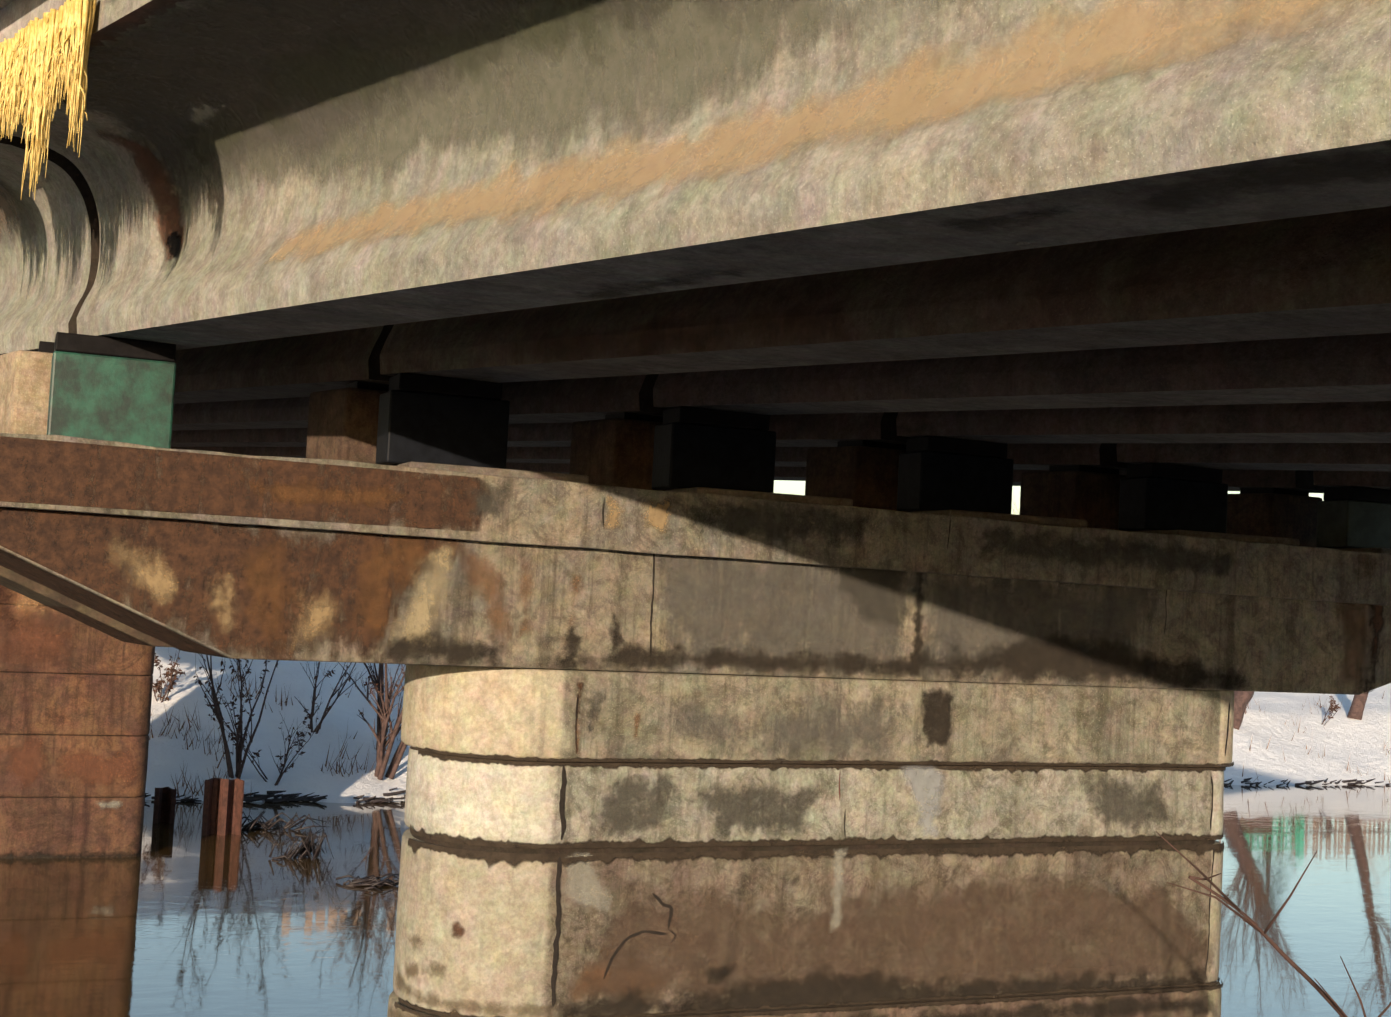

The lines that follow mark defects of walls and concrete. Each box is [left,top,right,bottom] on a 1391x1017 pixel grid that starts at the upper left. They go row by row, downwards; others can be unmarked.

corrosion [97,132,182,259]
corrosion [0,436,490,663]
damp [648,500,672,530]
damp [690,504,867,545]
damp [982,528,1231,577]
damp [389,634,499,666]
damp [555,556,1246,752]
corrosion [1342,603,1385,693]
damp [601,776,672,835]
damp [699,786,813,837]
damp [1088,779,1168,828]
crack [603,893,676,980]